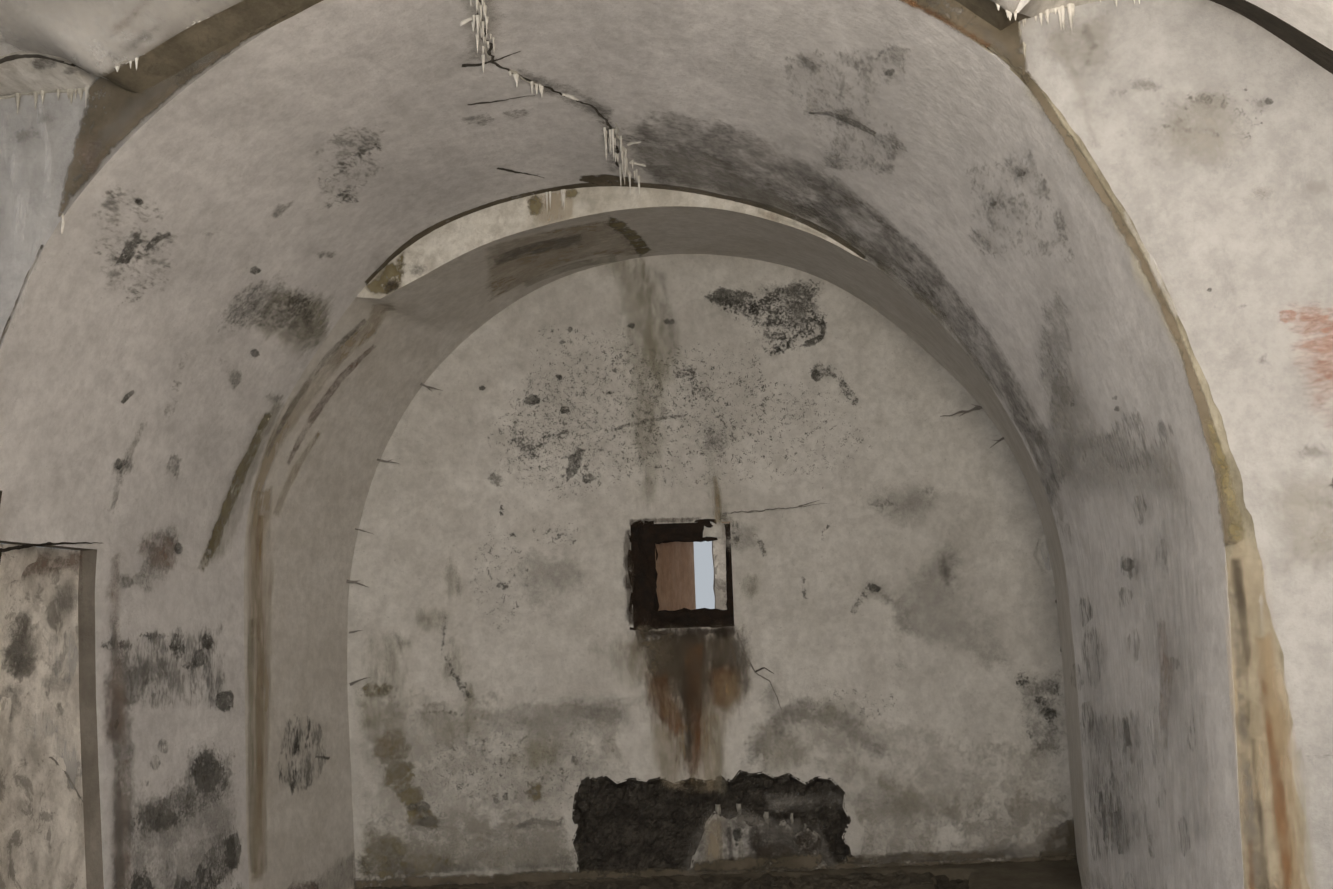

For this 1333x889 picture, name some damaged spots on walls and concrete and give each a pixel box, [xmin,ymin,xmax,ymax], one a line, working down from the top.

crack [462,0,624,181]
damp [809,88,897,159]
damp [114,233,172,275]
damp [493,120,975,321]
damp [500,279,864,491]
mould [102,631,241,889]
damp [422,628,472,716]
damp [354,703,1134,889]
damp [1016,675,1059,750]